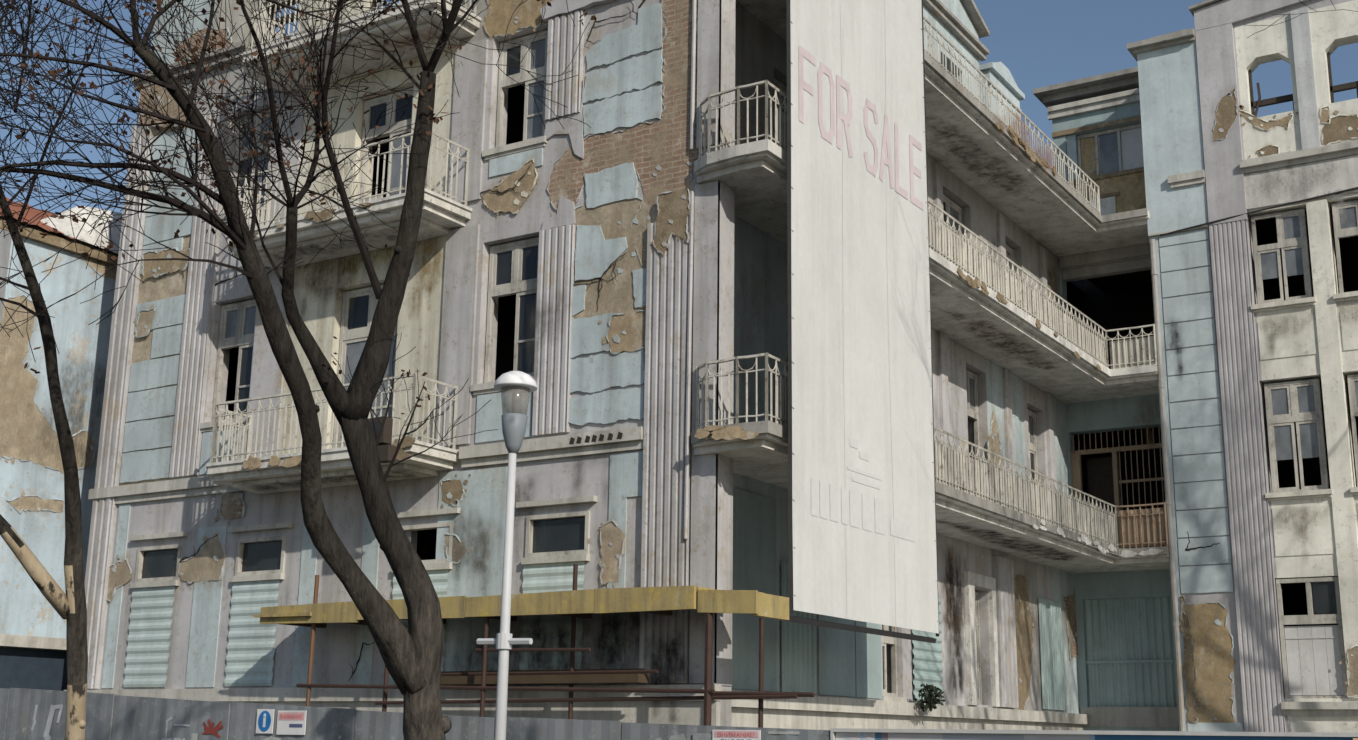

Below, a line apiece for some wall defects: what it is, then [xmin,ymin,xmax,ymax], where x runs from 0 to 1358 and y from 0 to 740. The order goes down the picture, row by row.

peeling [1213,88,1298,157]
peeling [1320,106,1358,145]
peeling [472,0,699,355]
peeling [0,294,97,479]
peeling [178,492,246,584]
peeling [588,519,625,587]
peeling [1014,573,1034,710]
peeling [1179,595,1236,723]
peeling [1339,645,1358,698]